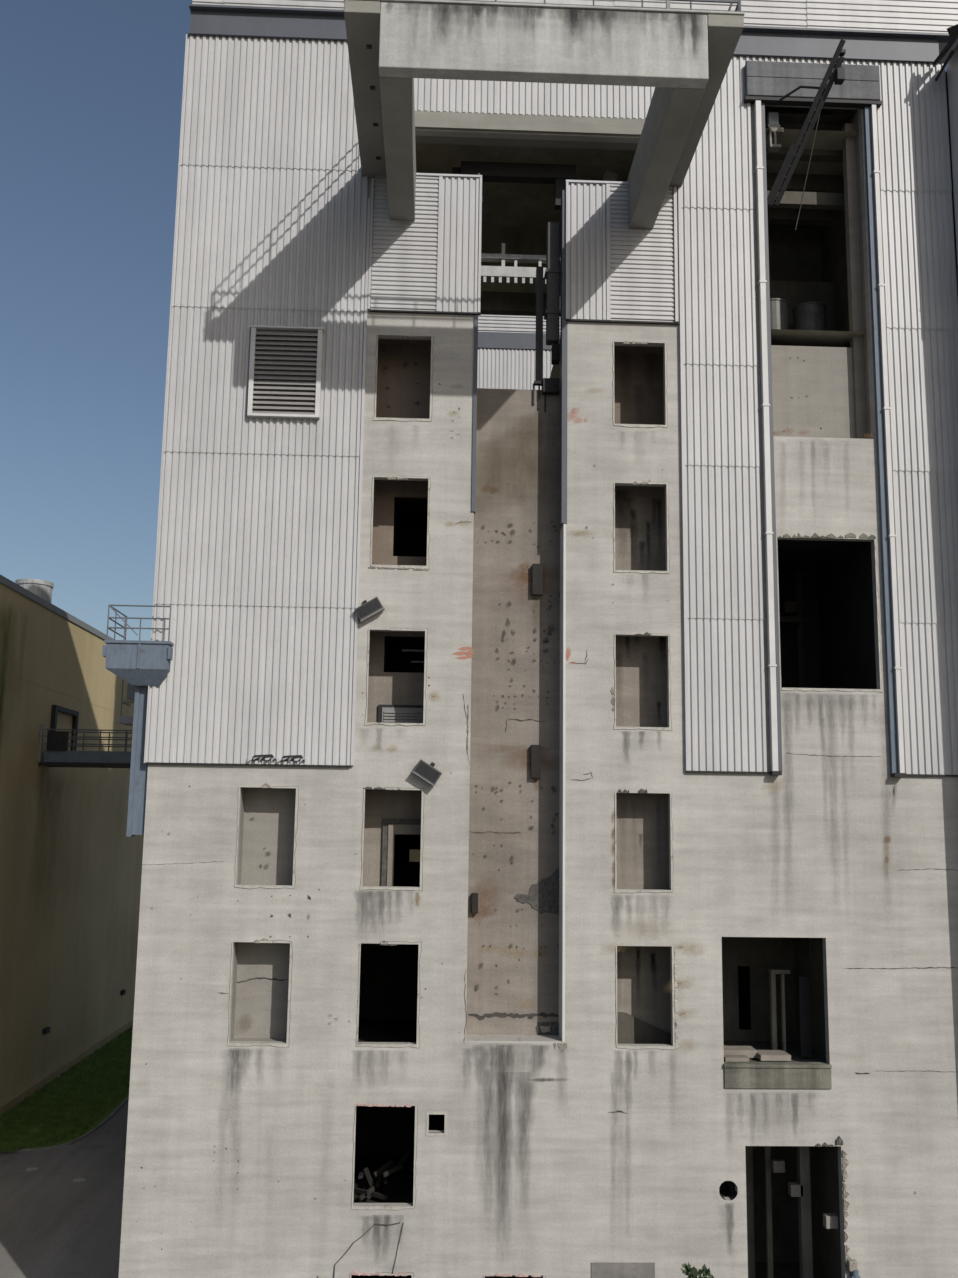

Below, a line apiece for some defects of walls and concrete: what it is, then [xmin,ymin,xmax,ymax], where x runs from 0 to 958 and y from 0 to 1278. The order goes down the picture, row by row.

spalling [514,868,559,927]
crack [223,977,289,994]
spalling [536,1022,567,1052]